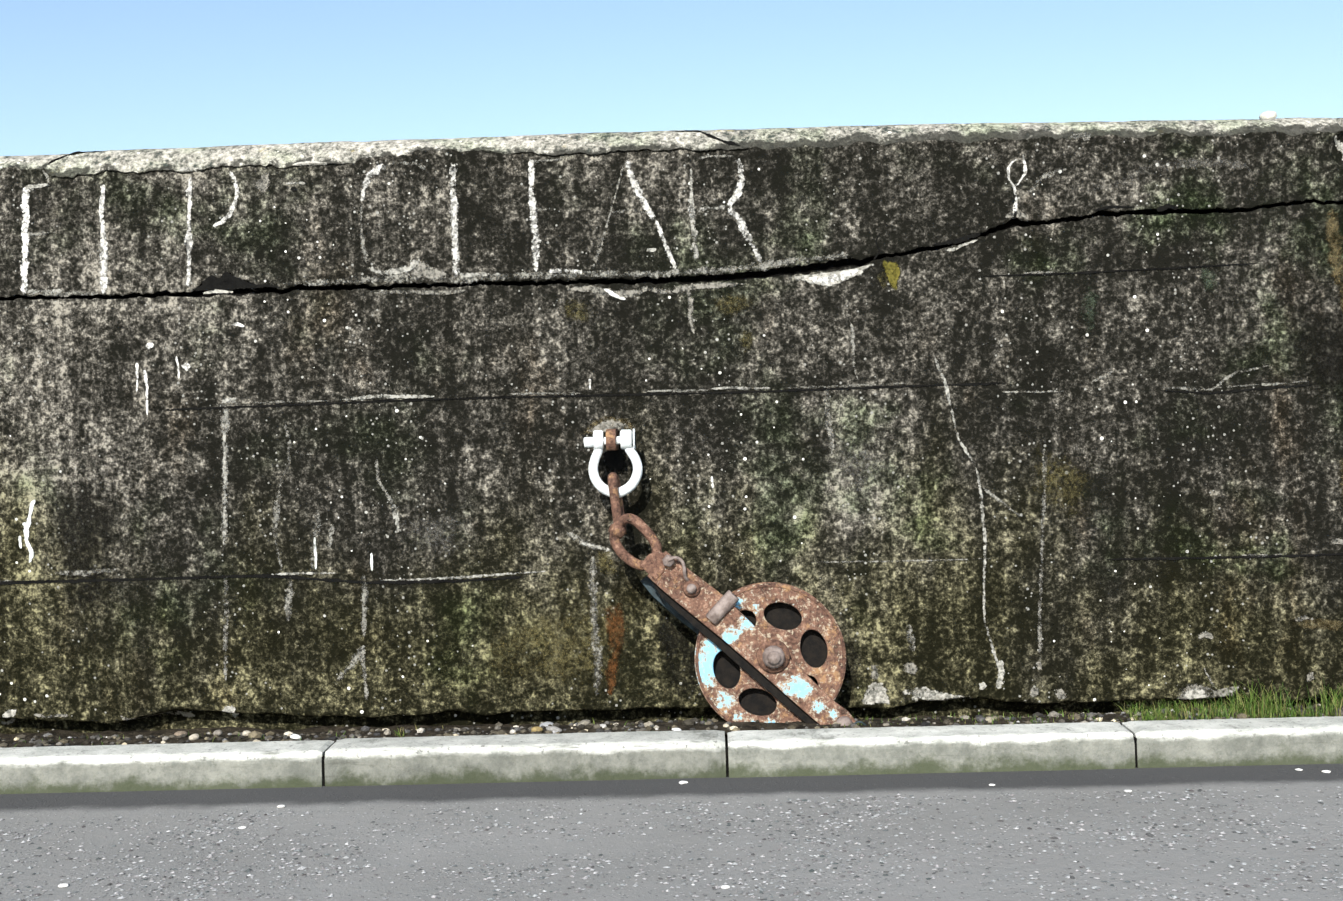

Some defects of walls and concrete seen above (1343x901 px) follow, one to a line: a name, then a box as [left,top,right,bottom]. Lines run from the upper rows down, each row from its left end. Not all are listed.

crack [0,195,1343,310]